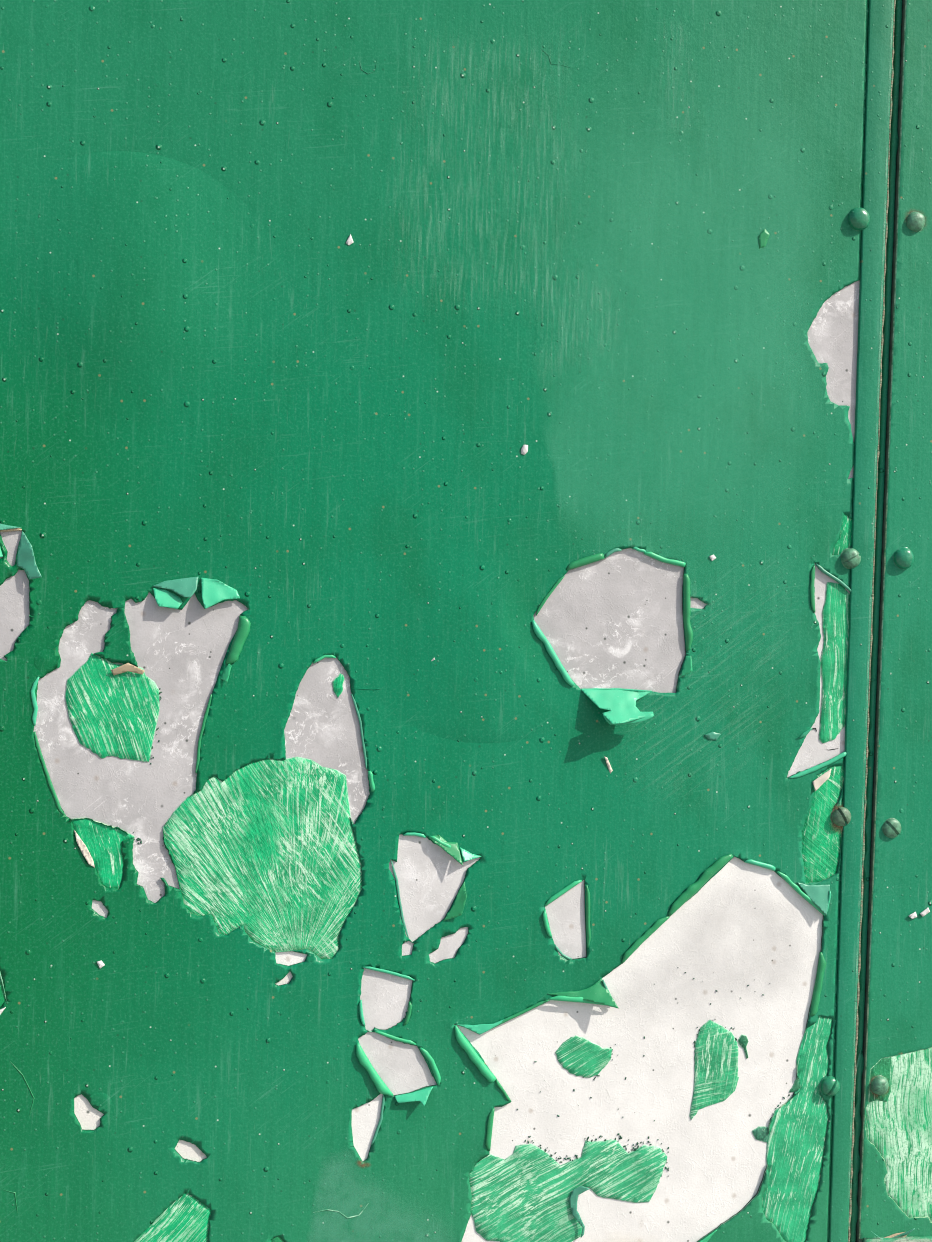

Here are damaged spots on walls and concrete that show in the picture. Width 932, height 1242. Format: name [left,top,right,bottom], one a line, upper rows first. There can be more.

peeling [807,280,860,441]
peeling [0,524,42,661]
peeling [31,577,251,903]
peeling [284,655,375,824]
peeling [531,547,706,725]
peeling [787,563,851,791]
peeling [92,900,108,918]
peeling [389,832,481,963]
peeling [352,967,441,1161]
peeling [454,854,831,1242]